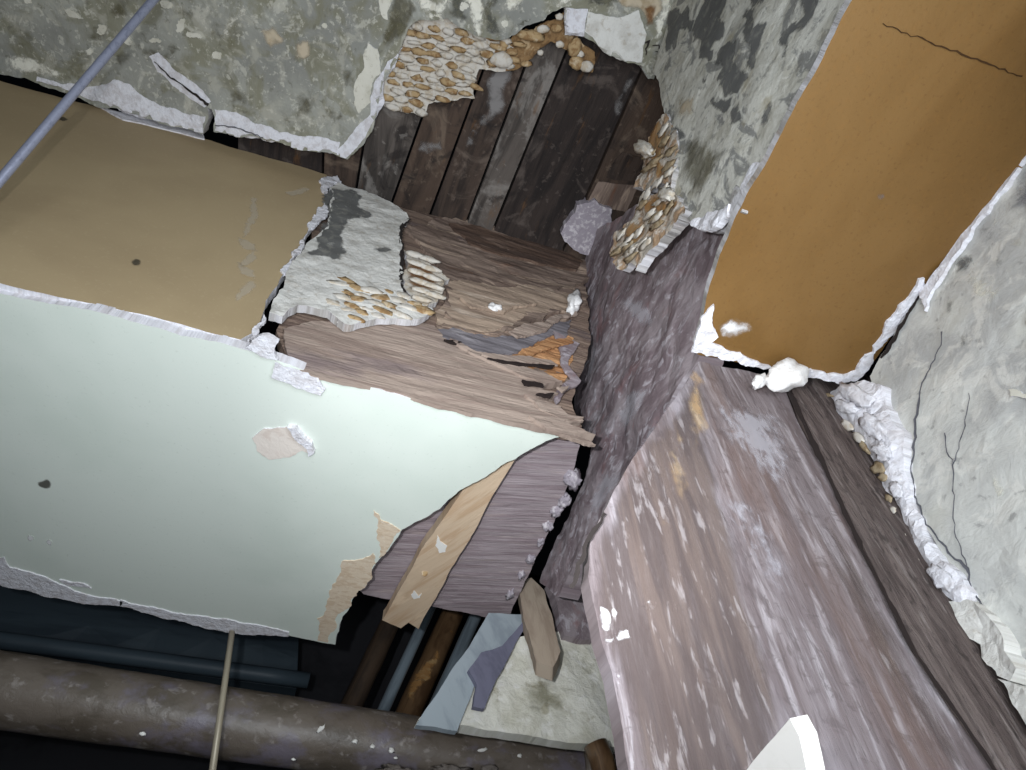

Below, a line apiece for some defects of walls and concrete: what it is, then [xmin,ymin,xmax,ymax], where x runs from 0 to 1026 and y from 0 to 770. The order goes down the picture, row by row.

flaking render [379,0,392,20]
peeling [419,0,766,124]
peeling [779,0,818,57]
crack [883,23,1022,77]
flaking render [609,113,761,273]
flaking render [269,182,449,332]
crack [910,331,983,605]
flaking render [826,380,1026,724]
peeling [601,607,629,641]